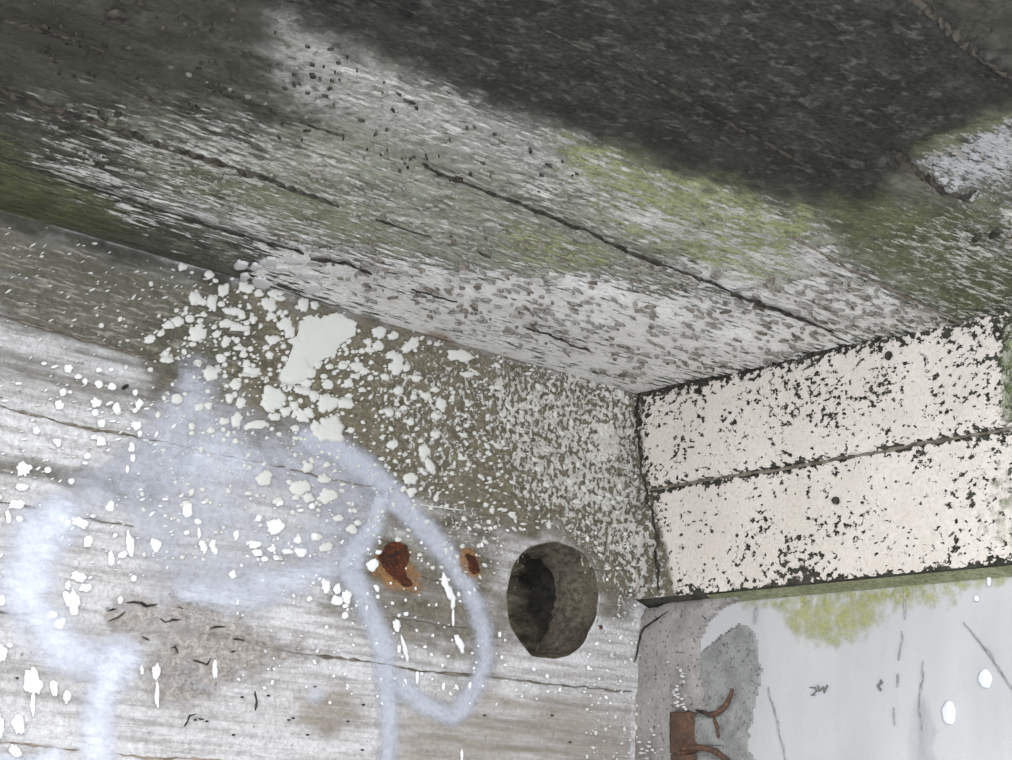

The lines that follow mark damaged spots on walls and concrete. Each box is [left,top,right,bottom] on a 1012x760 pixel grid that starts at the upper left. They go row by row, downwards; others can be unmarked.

water stain [261,267,309,287]
water stain [770,213,960,351]
peeling [20,47,1012,629]
water stain [488,317,557,357]
water stain [526,317,588,352]
water stain [592,292,786,386]
water stain [0,465,18,475]
water stain [30,464,130,495]
rust [373,542,420,592]
water stain [361,515,480,659]
rust [460,548,480,577]
water stain [448,542,512,639]